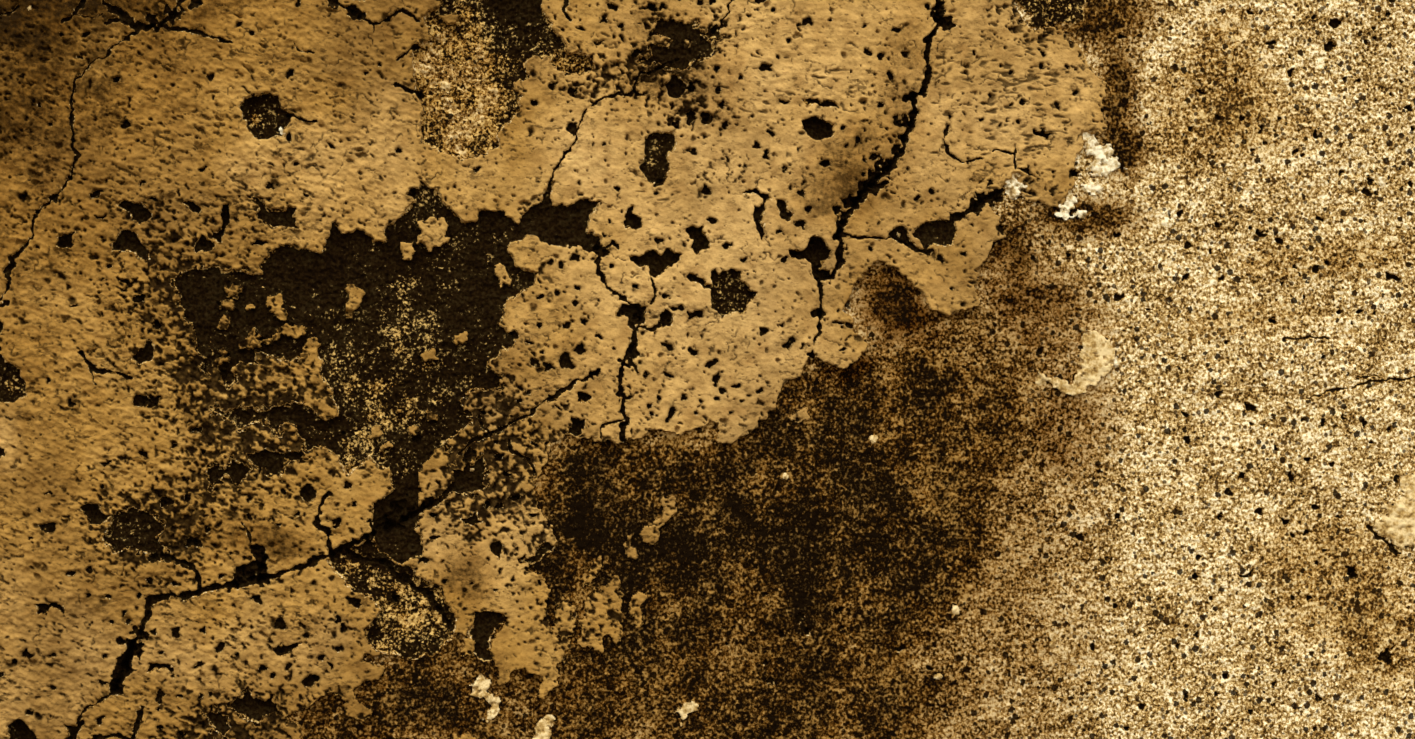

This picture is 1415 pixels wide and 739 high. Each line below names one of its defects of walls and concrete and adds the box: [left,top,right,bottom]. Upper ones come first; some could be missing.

crack [0,0,233,351]
flaking render [173,182,647,688]
flaking render [412,0,625,173]
crack [458,241,662,474]
crack [549,58,680,186]
flaking render [631,0,729,195]
spalling [615,217,763,422]
water stain [290,0,1150,739]
spalling [741,188,832,279]
crack [806,0,1040,359]
crack [76,491,453,739]
water stain [1274,531,1412,670]